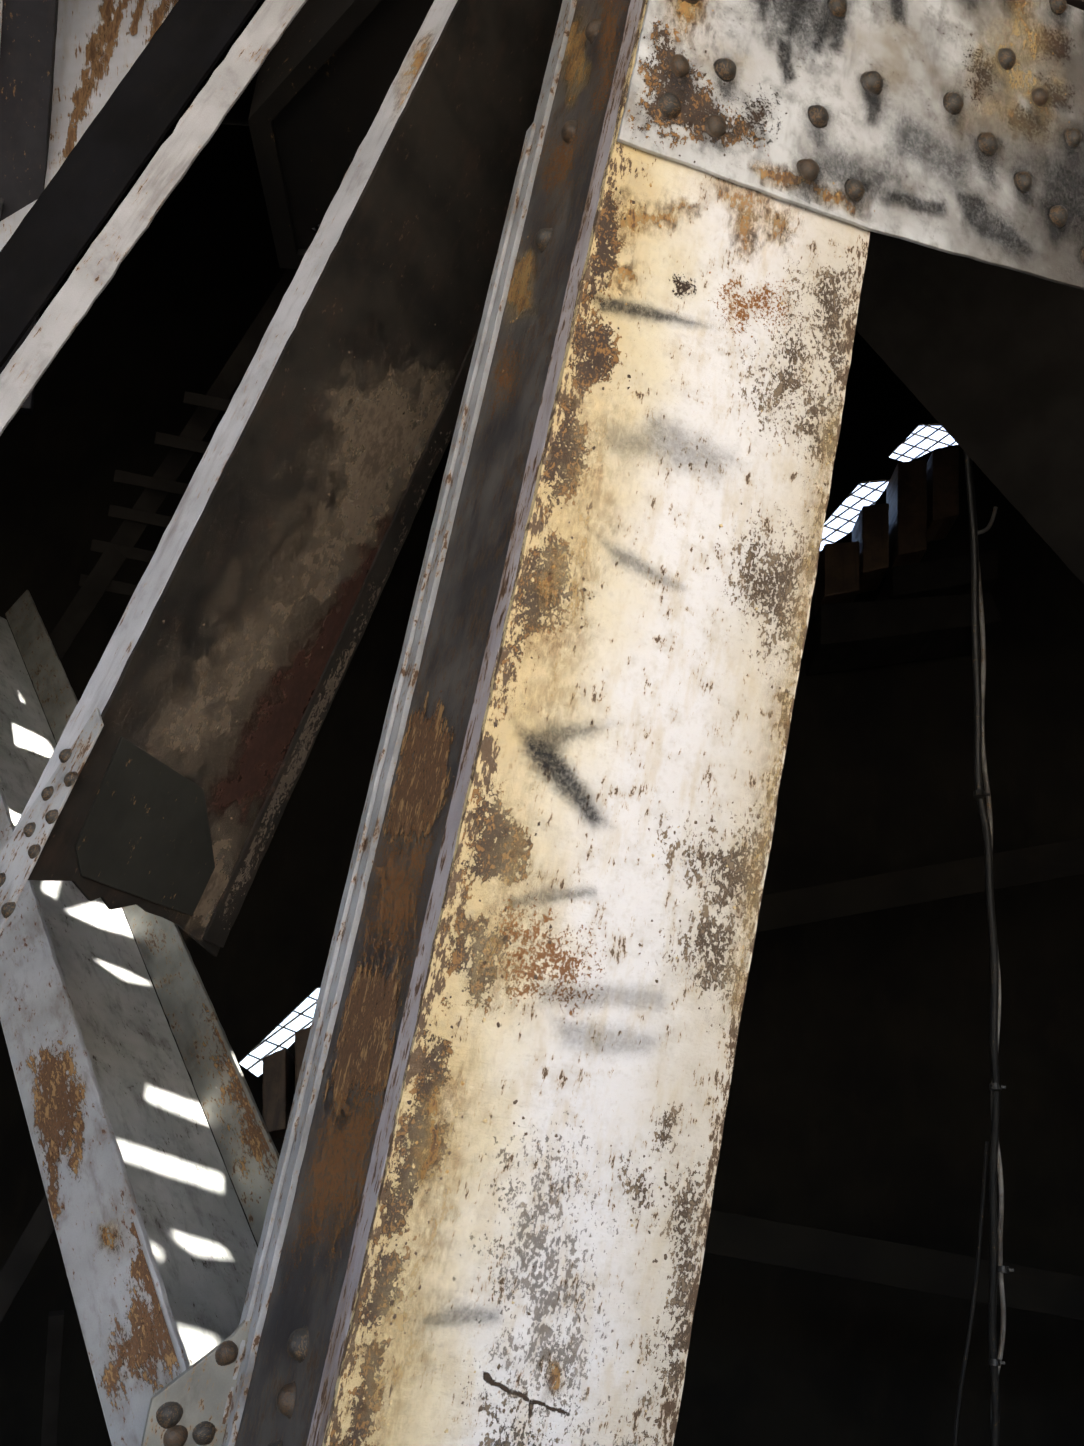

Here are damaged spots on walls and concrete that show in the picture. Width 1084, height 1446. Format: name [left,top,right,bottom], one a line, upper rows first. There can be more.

corrosion [670,0,714,34]
corrosion [617,200,697,240]
corrosion [717,165,856,255]
corrosion [600,264,637,305]
corrosion [708,271,796,342]
corrosion [535,509,589,676]
corrosion [481,860,609,1025]
corrosion [26,1035,86,1224]
corrosion [100,1191,180,1409]
crack [483,1371,570,1418]